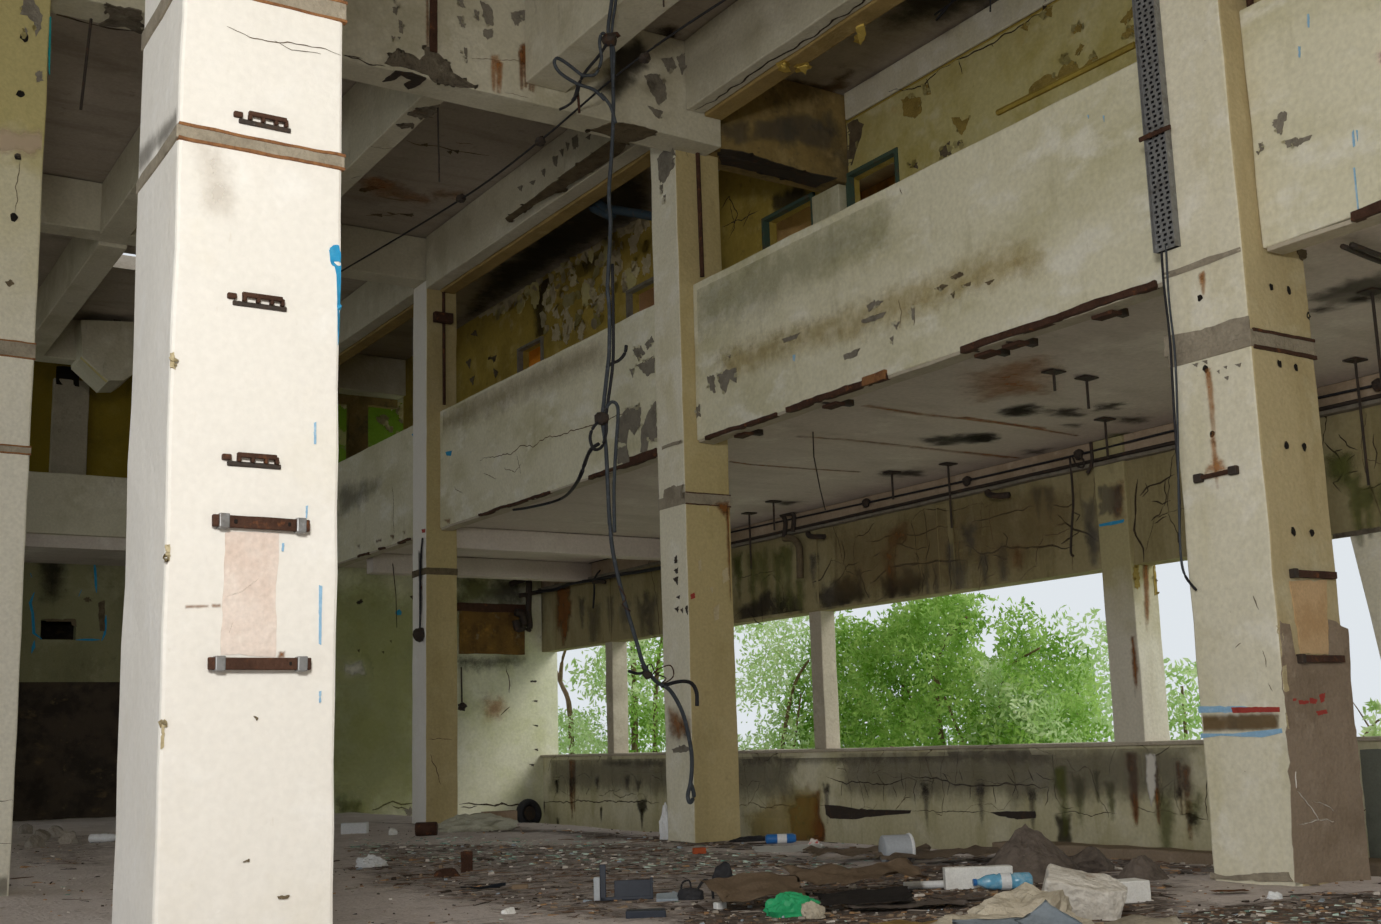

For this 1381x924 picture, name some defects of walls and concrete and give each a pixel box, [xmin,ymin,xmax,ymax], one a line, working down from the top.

crack [227,26,383,66]
spalling [382,0,478,89]
peeling [457,0,494,40]
spalling [505,51,687,222]
peeling [1256,111,1312,155]
corrosion [1208,436,1224,471]
water stain [737,549,864,619]
mould [882,575,923,598]
crack [739,477,1097,625]
crack [739,745,1208,820]
water stain [1056,770,1114,842]
water stain [1146,754,1171,847]